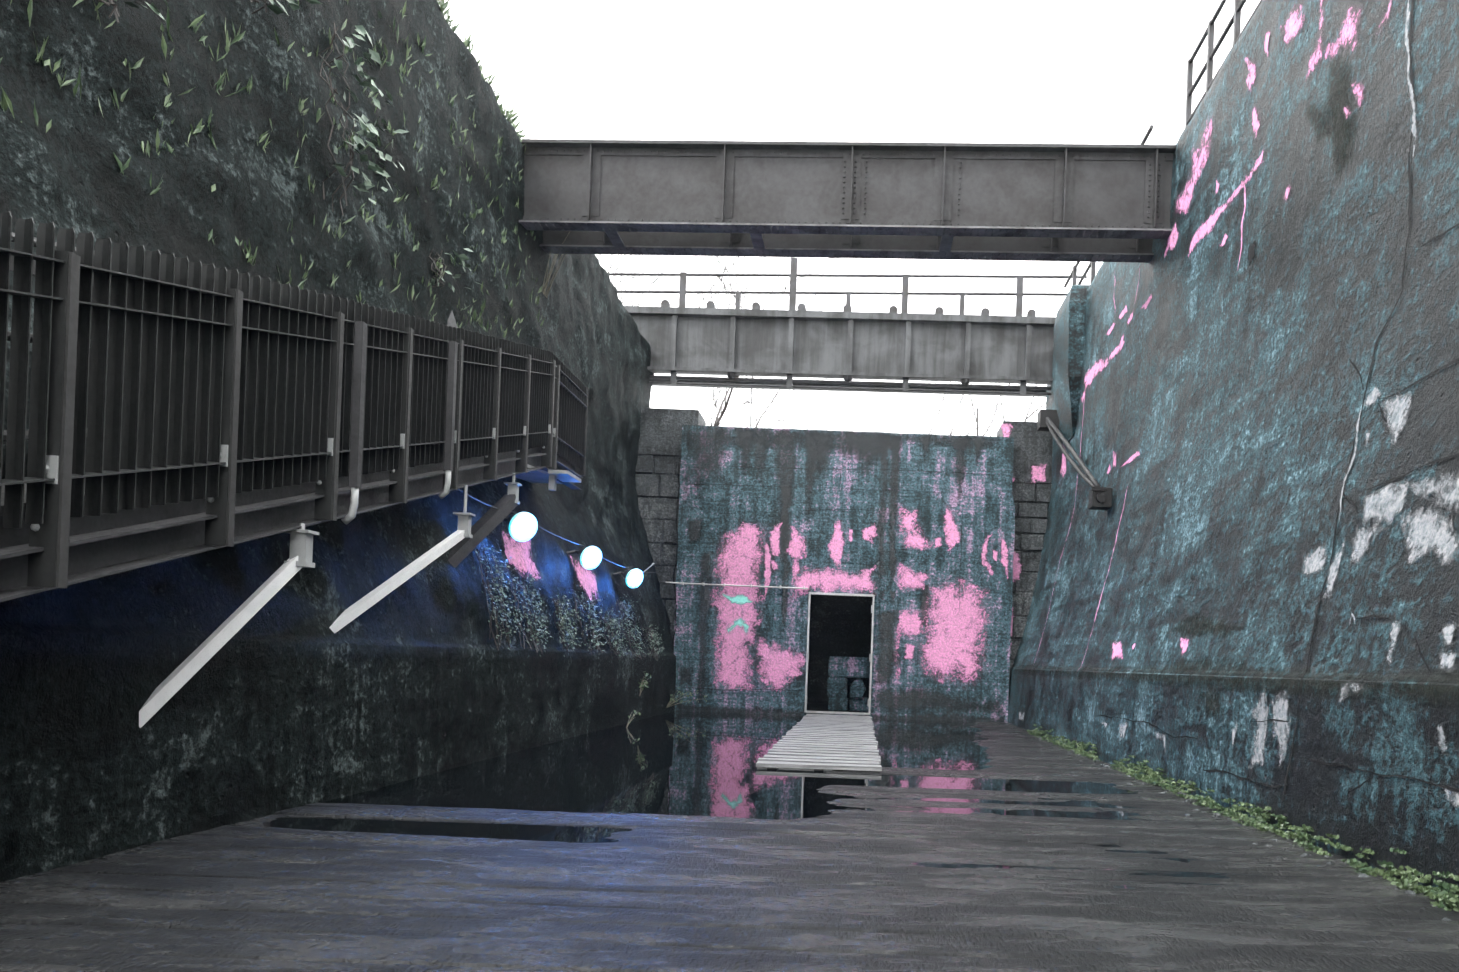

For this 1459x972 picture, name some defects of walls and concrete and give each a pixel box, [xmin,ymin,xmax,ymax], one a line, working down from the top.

leakage [676,426,1005,722]
crack [1099,0,1459,820]